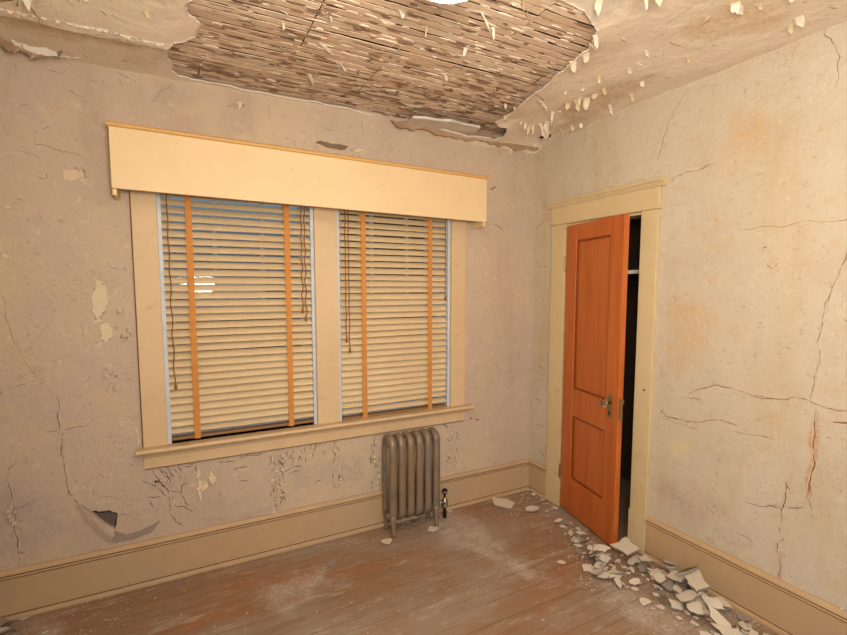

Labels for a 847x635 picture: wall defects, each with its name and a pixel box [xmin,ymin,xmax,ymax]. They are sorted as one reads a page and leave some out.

peeling [0,36,88,59]
flaking render [166,0,621,155]
peeling [730,1,744,15]
peeling [787,15,805,35]
crack [744,219,847,230]
peeling [91,278,113,343]
crack [0,290,94,513]
crack [660,409,775,440]
crack [684,250,847,578]
crack [5,461,28,567]
crack [143,463,196,526]